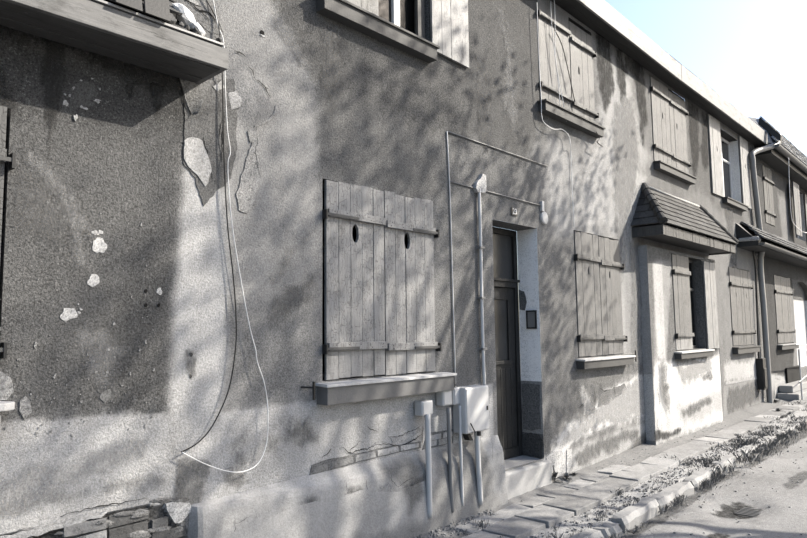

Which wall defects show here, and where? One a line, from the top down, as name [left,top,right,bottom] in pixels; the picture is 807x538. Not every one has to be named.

damp [0,25,183,129]
peeling [180,78,260,213]
damp [688,104,708,177]
damp [556,32,647,445]
damp [661,364,670,409]
damp [677,357,712,382]
damp [683,399,711,416]
flaking render [309,427,453,475]
damp [576,428,681,465]
flaking render [0,497,191,538]